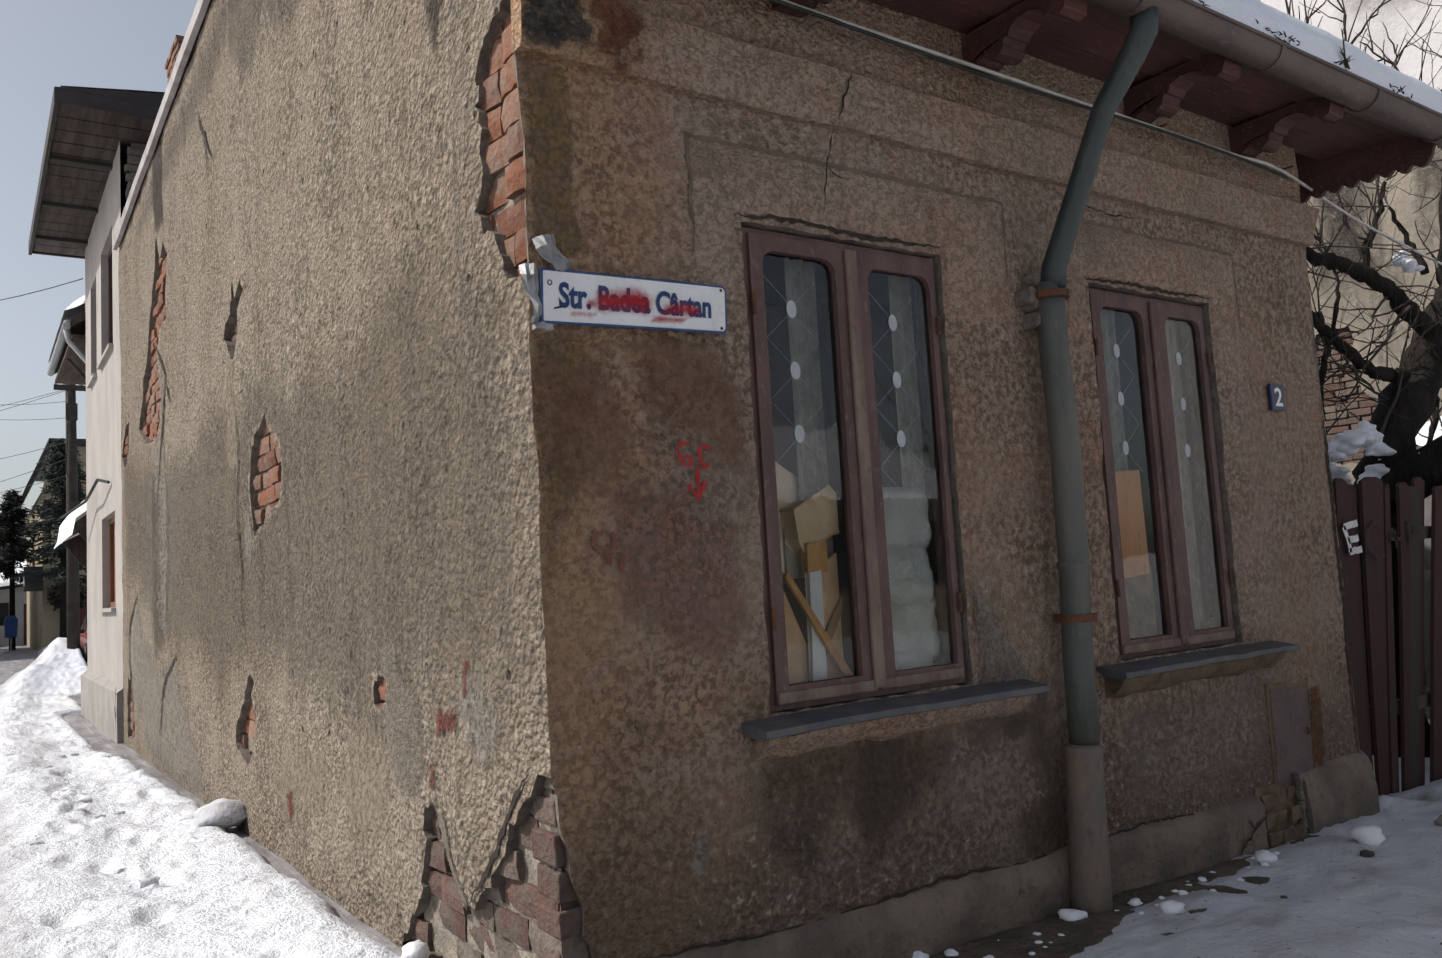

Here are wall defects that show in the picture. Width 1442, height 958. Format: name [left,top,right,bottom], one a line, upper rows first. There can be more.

flaking render [475,0,582,279]
crack [735,71,943,248]
flaking render [122,240,167,468]
flaking render [223,280,243,361]
flaking render [249,413,282,536]
crack [114,595,177,738]
flaking render [236,674,256,765]
flaking render [402,771,594,958]